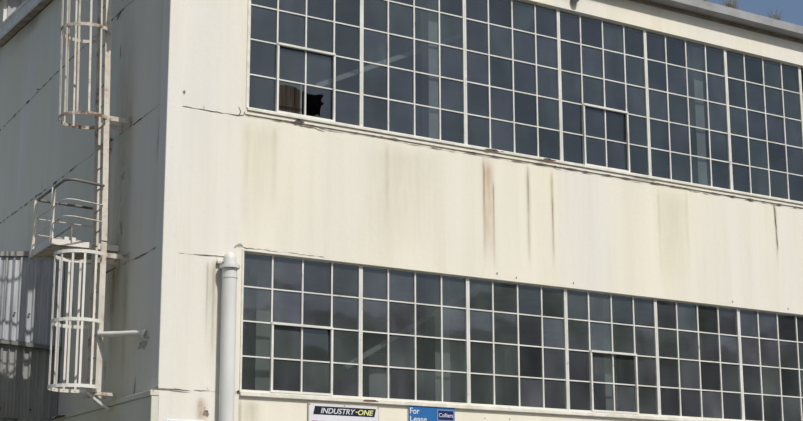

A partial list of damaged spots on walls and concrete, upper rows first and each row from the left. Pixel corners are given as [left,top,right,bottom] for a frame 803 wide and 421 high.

crack [0,154,93,224]
crack [184,106,802,246]